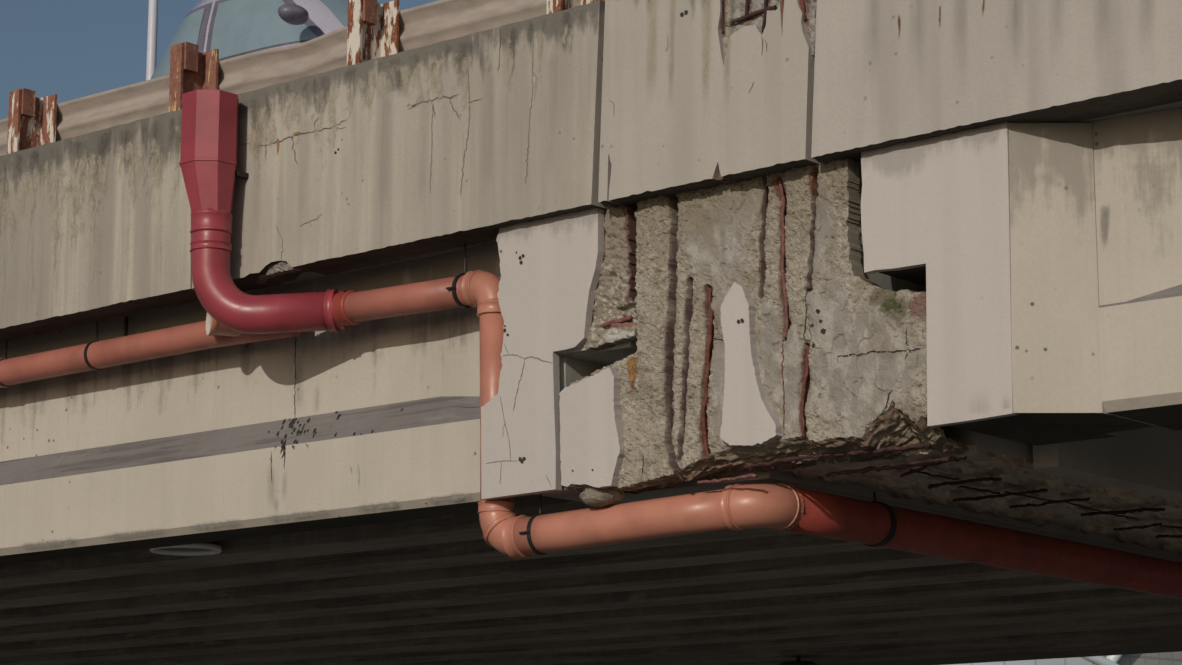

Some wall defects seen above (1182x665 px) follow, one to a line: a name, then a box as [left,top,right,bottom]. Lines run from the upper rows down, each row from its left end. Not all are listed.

spalling [721,0,784,56]
spalling [800,0,817,56]
crack [242,119,347,164]
crack [408,49,480,196]
rust [809,172,818,199]
spalling [559,158,1182,555]
crack [446,344,551,480]